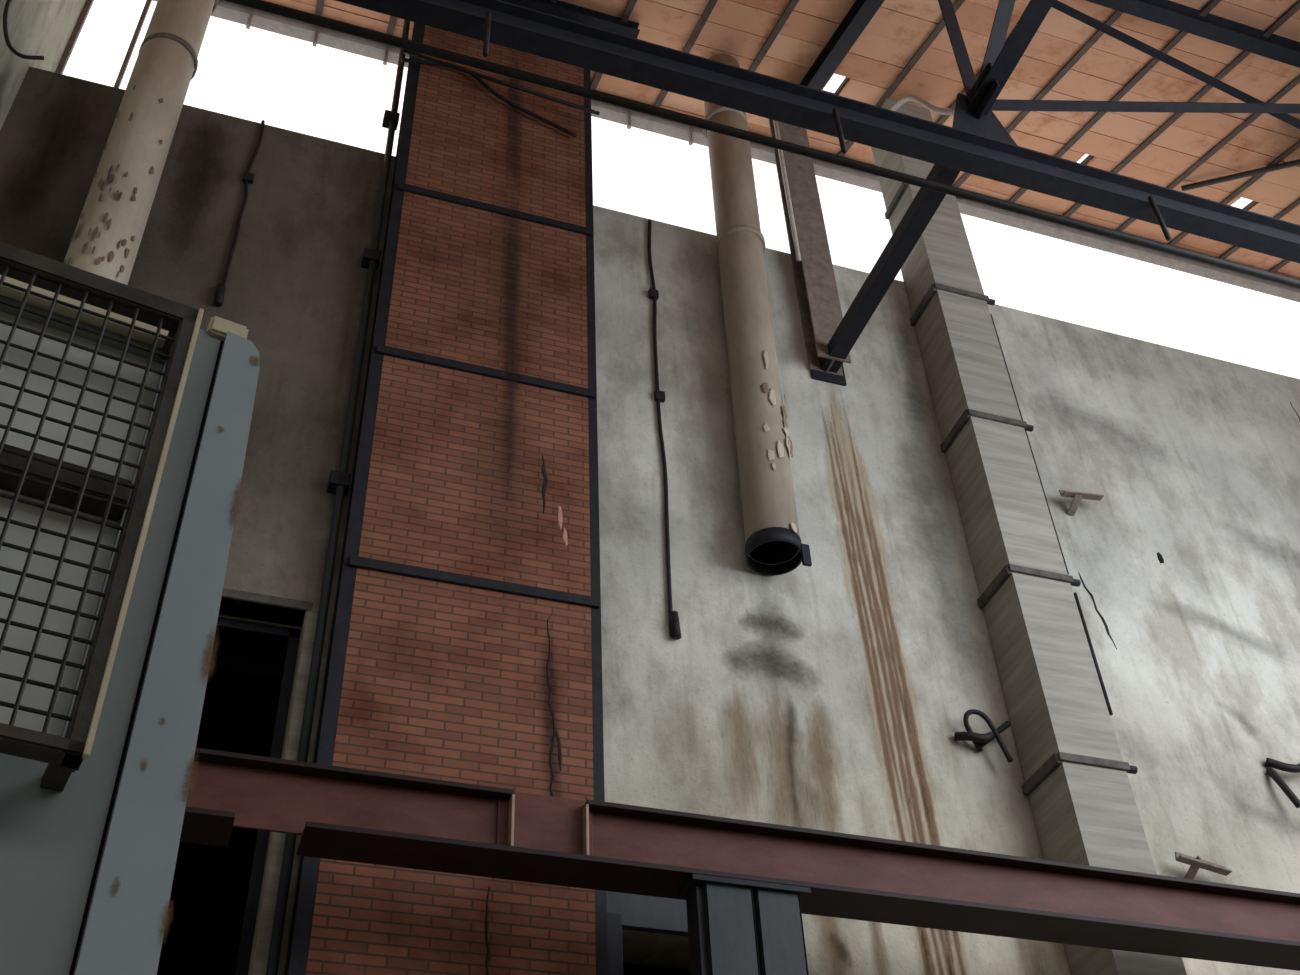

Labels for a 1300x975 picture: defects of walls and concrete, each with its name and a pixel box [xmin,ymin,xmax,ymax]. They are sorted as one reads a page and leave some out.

crack [540,454,548,514]
crack [546,614,562,796]
corrosion [828,408,939,846]
corrosion [917,927,966,975]